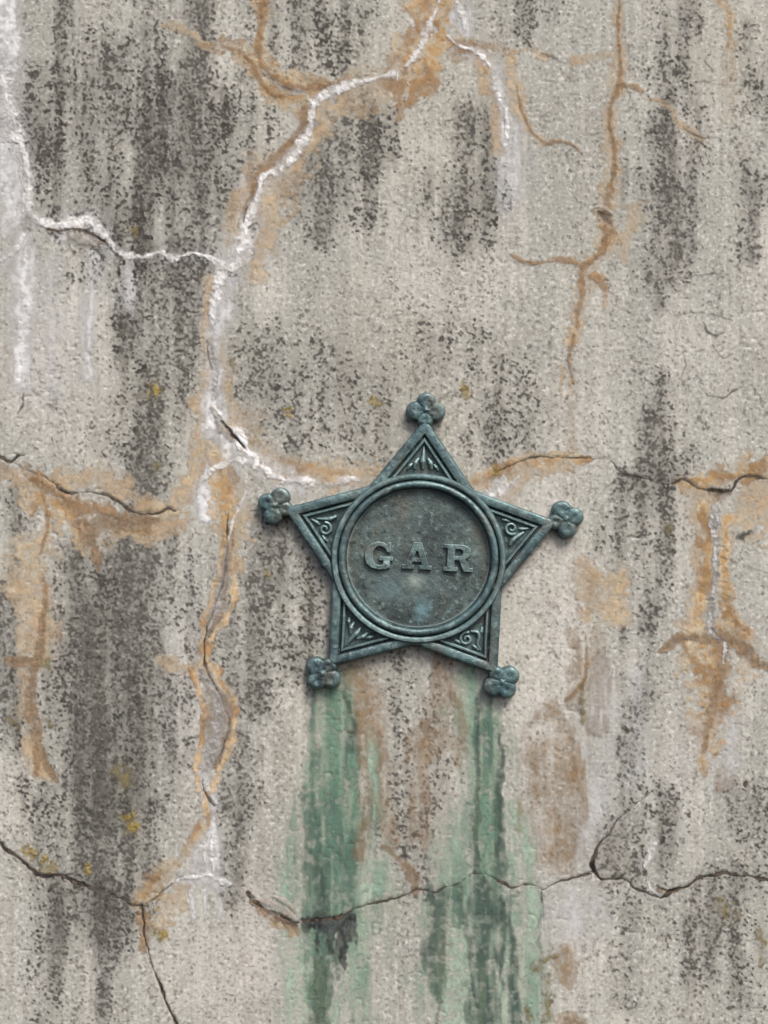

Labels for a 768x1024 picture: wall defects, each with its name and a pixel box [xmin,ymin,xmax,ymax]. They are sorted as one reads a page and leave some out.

rust [231,0,360,284]
rust [510,1,658,384]
damp [626,1,709,311]
crack [0,454,176,515]
crack [0,841,192,1024]
rust [4,275,256,842]
damp [0,0,520,1024]
damp [279,650,587,1024]
crack [246,789,768,923]
crack [501,455,768,493]
damp [579,367,700,1009]
rust [657,454,768,777]